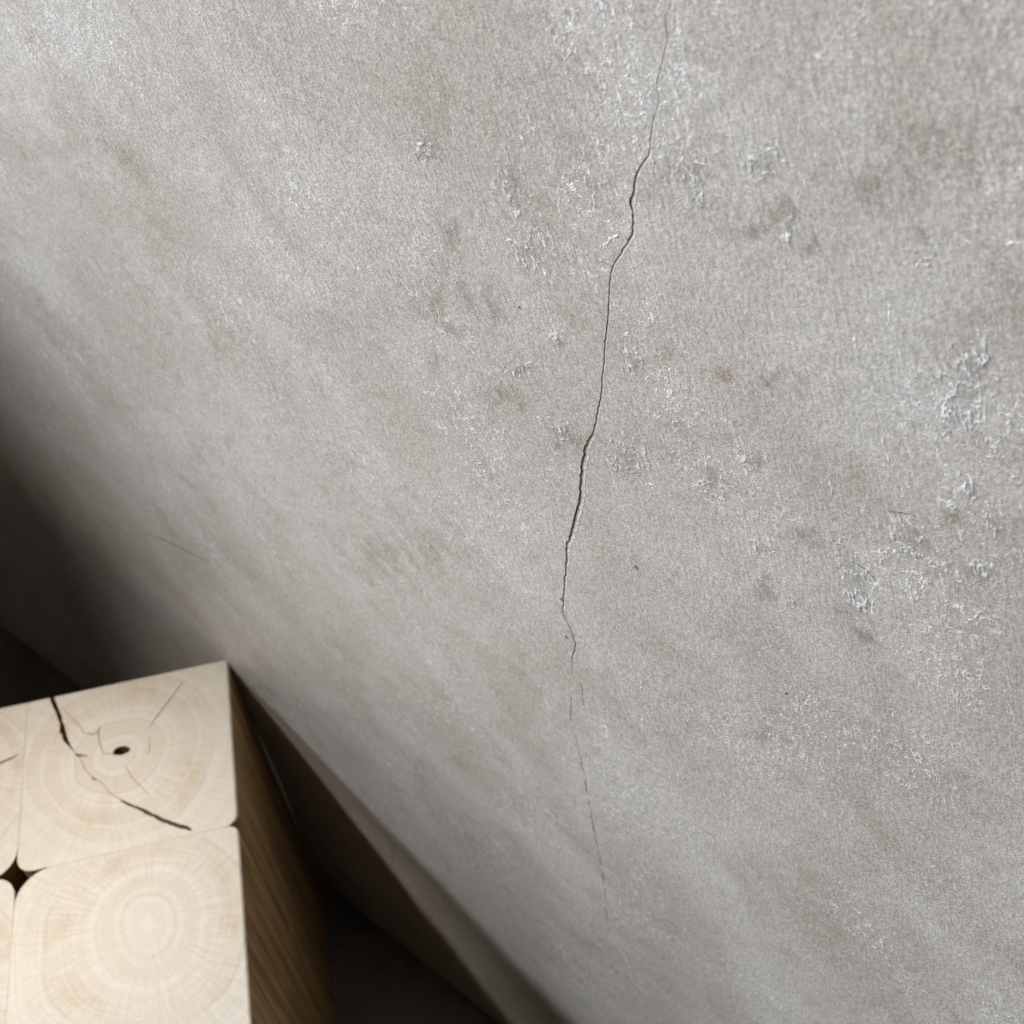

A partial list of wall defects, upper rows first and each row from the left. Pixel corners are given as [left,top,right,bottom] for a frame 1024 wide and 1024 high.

crack [562,0,673,936]